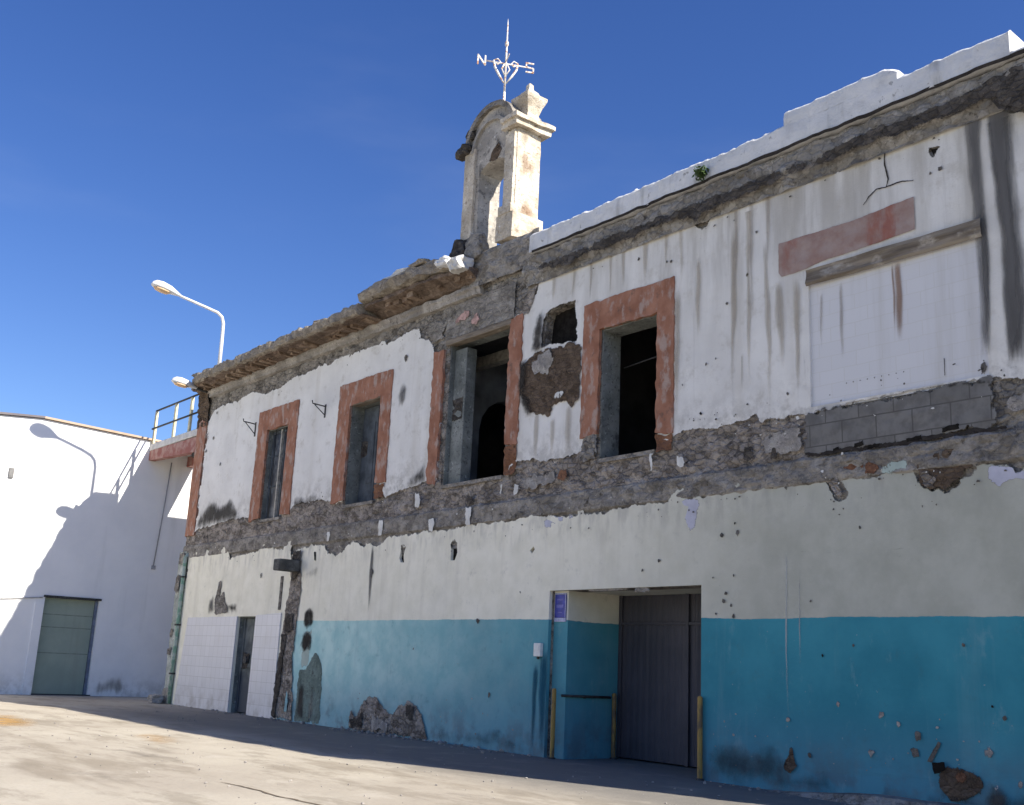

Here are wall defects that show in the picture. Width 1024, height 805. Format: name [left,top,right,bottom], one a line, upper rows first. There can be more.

crack [532,49,1024,253]
spalling [538,65,1024,270]
damp [965,110,1024,352]
flaking render [978,360,1024,431]
damp [198,502,237,525]
flaking render [174,403,808,592]
spalling [821,449,1024,515]
spalling [214,581,227,615]
spalling [271,550,322,724]
spalling [348,696,427,740]
spalling [908,719,1006,805]